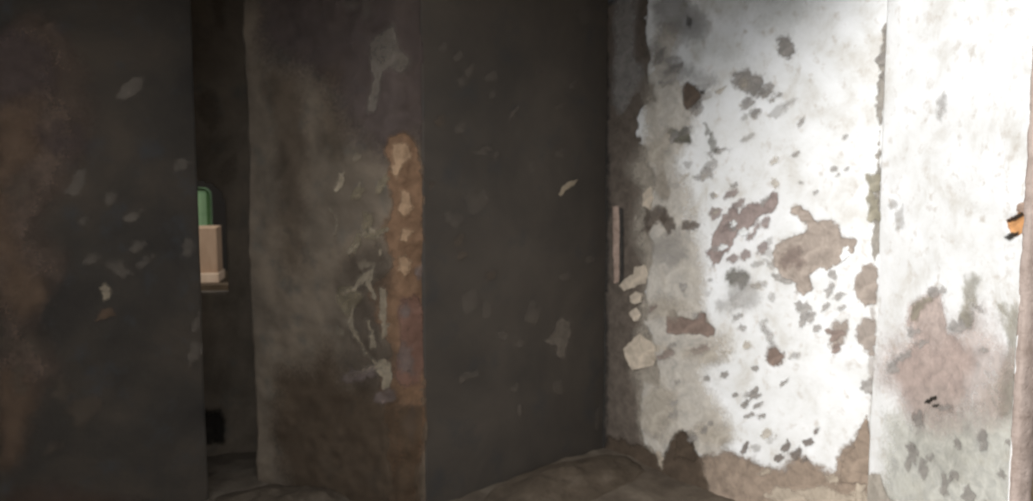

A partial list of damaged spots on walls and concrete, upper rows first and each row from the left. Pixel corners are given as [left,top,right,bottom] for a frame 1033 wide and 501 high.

spalling [716,69,782,109]
spalling [777,37,795,59]
spalling [334,132,426,501]
peeling [602,0,715,466]
damp [603,24,892,501]
spalling [732,386,771,438]
spalling [751,347,784,371]
spalling [706,179,857,353]